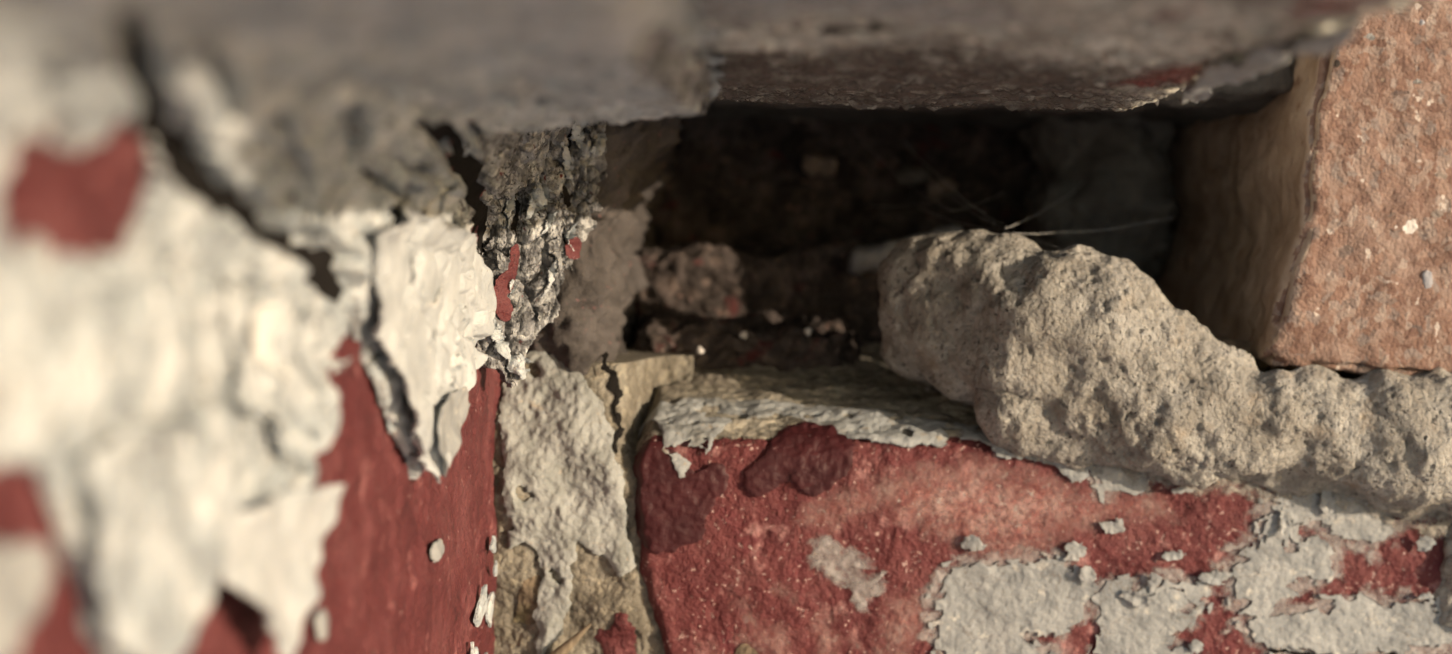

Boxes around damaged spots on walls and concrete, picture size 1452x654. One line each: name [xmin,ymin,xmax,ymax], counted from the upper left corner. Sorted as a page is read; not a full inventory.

crack [115,3,344,304]
peeling [0,0,727,654]
crack [415,119,521,258]
crack [558,128,573,283]
crack [600,352,625,453]
peeling [638,397,1452,654]